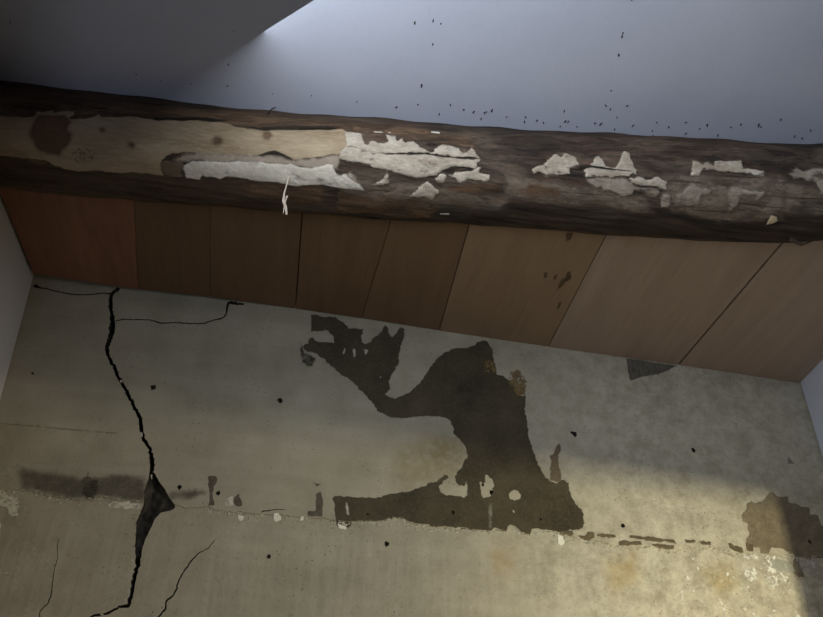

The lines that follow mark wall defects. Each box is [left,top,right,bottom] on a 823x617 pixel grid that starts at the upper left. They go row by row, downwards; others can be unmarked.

peeling [339,132,490,200]
peeling [532,151,764,208]
peeling [727,185,766,211]
peeling [790,168,823,194]
spalling [627,359,675,381]
crack [32,284,244,617]
damp [300,315,584,535]
damp [22,472,145,500]
damp [740,493,823,597]